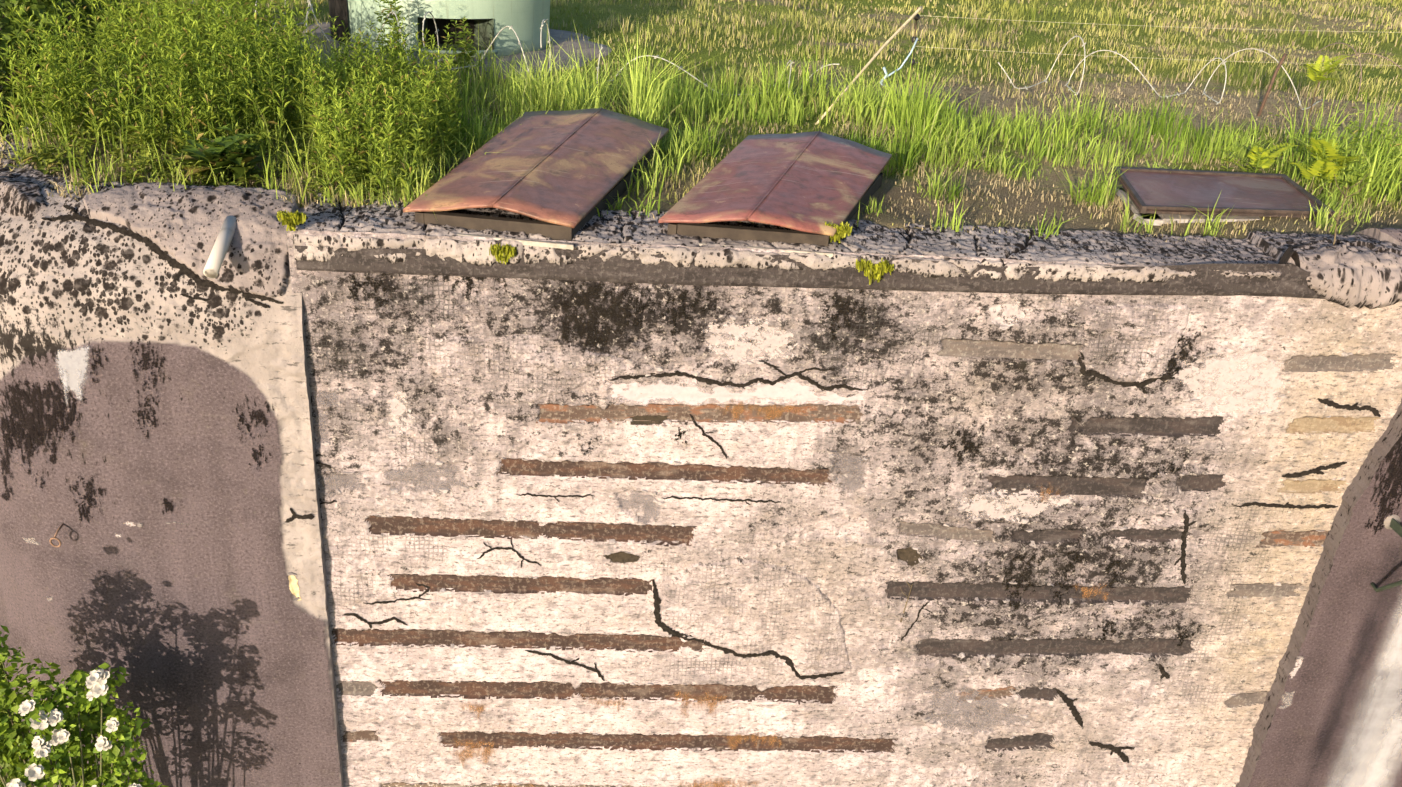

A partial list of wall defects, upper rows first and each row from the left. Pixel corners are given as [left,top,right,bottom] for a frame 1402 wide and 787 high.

crack [41,205,283,308]
damp [349,281,389,312]
damp [666,302,686,344]
damp [133,361,161,404]
crack [608,360,867,391]
damp [0,347,99,501]
damp [237,416,268,470]
crack [689,414,727,459]
crack [285,459,335,554]
damp [1374,489,1398,535]
crack [652,580,844,680]
damp [1333,620,1402,787]